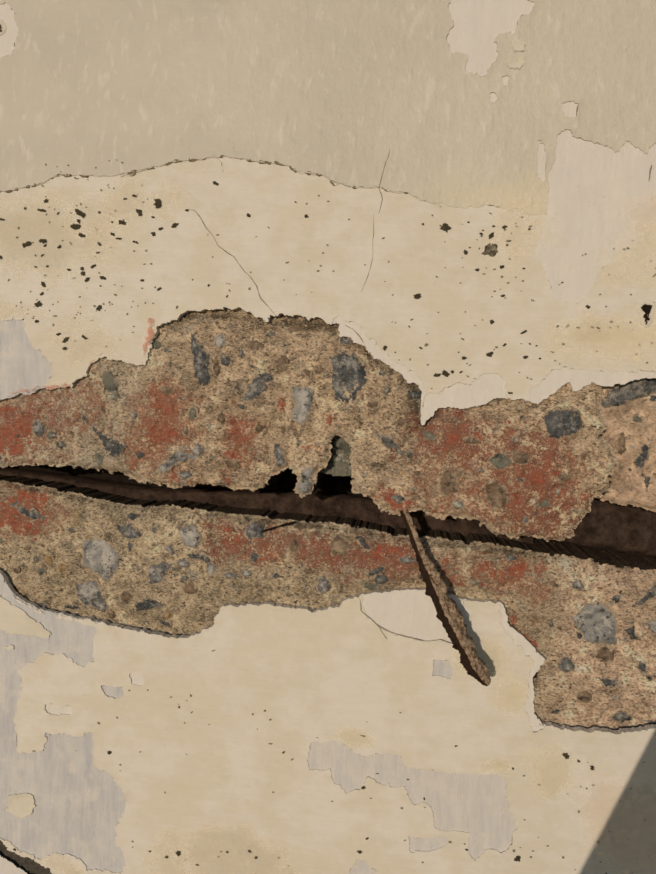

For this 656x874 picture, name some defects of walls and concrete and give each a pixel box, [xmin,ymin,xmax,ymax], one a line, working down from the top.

peeling [447,0,535,85]
crack [0,151,441,289]
crack [189,209,273,312]
spalling [482,243,498,257]
spalling [636,300,656,328]
rust [0,362,107,465]
rust [116,376,204,484]
rust [217,399,265,484]
rust [0,484,71,541]
rust [203,518,419,585]
crack [0,465,656,556]
spalling [0,308,656,873]